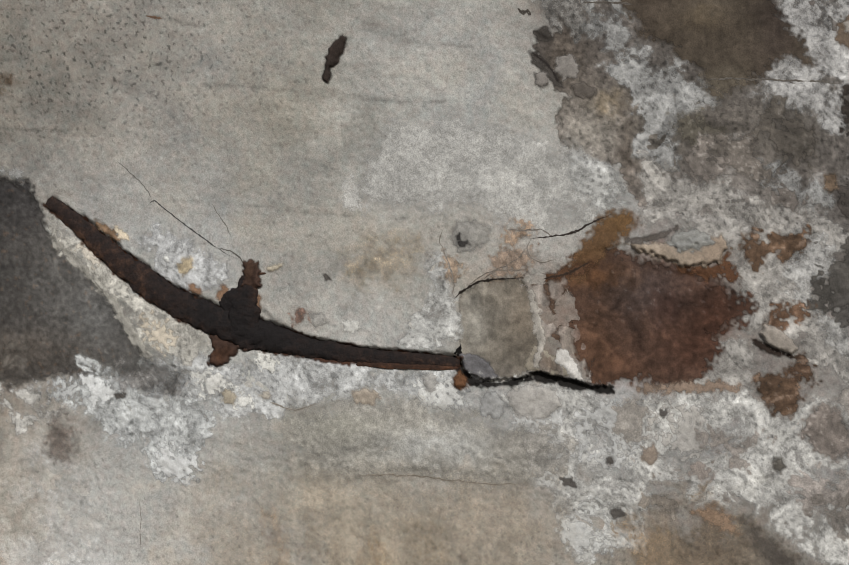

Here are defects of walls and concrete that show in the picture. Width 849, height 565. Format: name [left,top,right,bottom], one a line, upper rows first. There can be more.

peeling [530,0,849,234]
water stain [0,213,476,485]
rust [43,196,463,370]
rust [489,219,534,279]
crack [439,214,611,297]
crack [453,344,615,394]
water stain [500,0,849,565]
peeling [625,225,728,268]
rust [532,209,822,420]
peeling [752,324,798,358]
spalling [560,477,577,488]
flaking render [641,443,659,465]